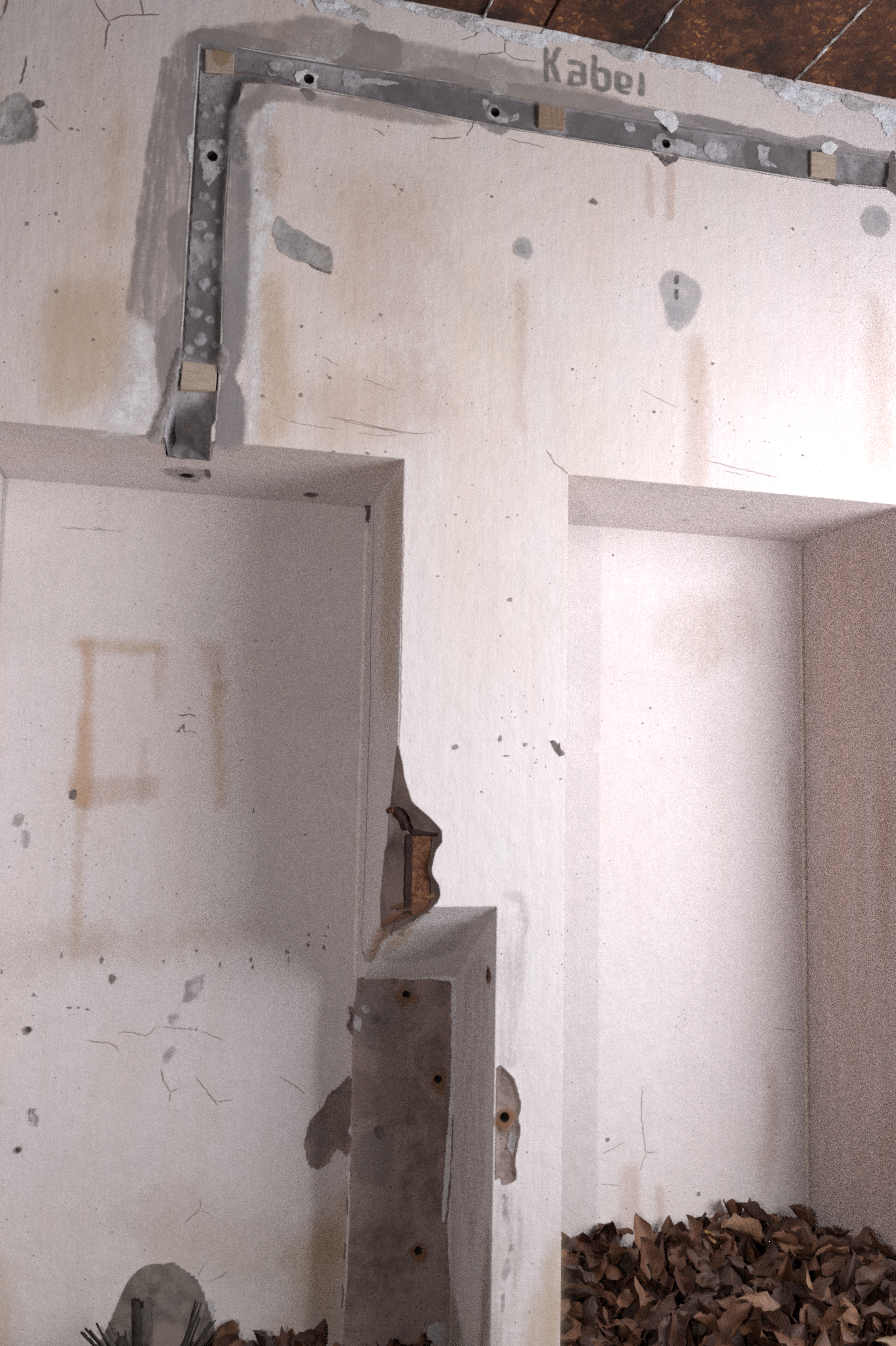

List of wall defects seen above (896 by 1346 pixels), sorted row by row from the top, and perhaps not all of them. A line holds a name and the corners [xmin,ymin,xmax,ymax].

crack [95,0,160,48]
spalling [0,93,45,145]
peeling [749,74,896,195]
spalling [272,216,334,275]
spalling [862,207,890,235]
spalling [661,273,701,328]
spalling [380,745,442,937]
crack [87,1026,225,1050]
crack [161,1072,231,1105]
spalling [495,1065,521,1185]
peeling [304,977,454,1346]